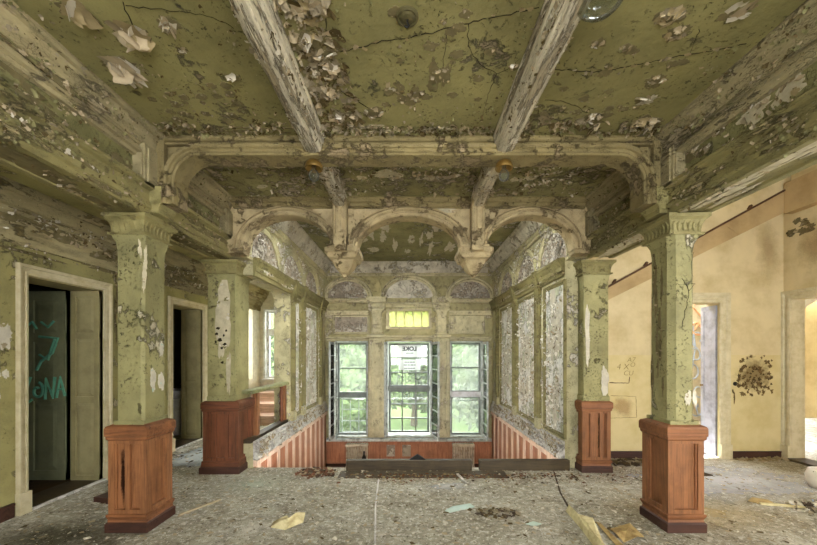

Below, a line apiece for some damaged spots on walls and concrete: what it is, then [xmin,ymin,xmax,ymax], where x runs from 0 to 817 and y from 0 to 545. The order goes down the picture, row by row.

crack [123,2,234,29]
peeling [288,0,342,106]
crack [323,7,539,112]
peeling [685,72,807,164]
peeling [0,144,114,208]
peeling [681,141,817,212]
peeling [138,239,147,292]
peeling [0,323,12,350]
peeling [215,280,231,395]
peeling [650,254,664,398]
peeling [150,368,165,392]
peeling [685,388,697,407]